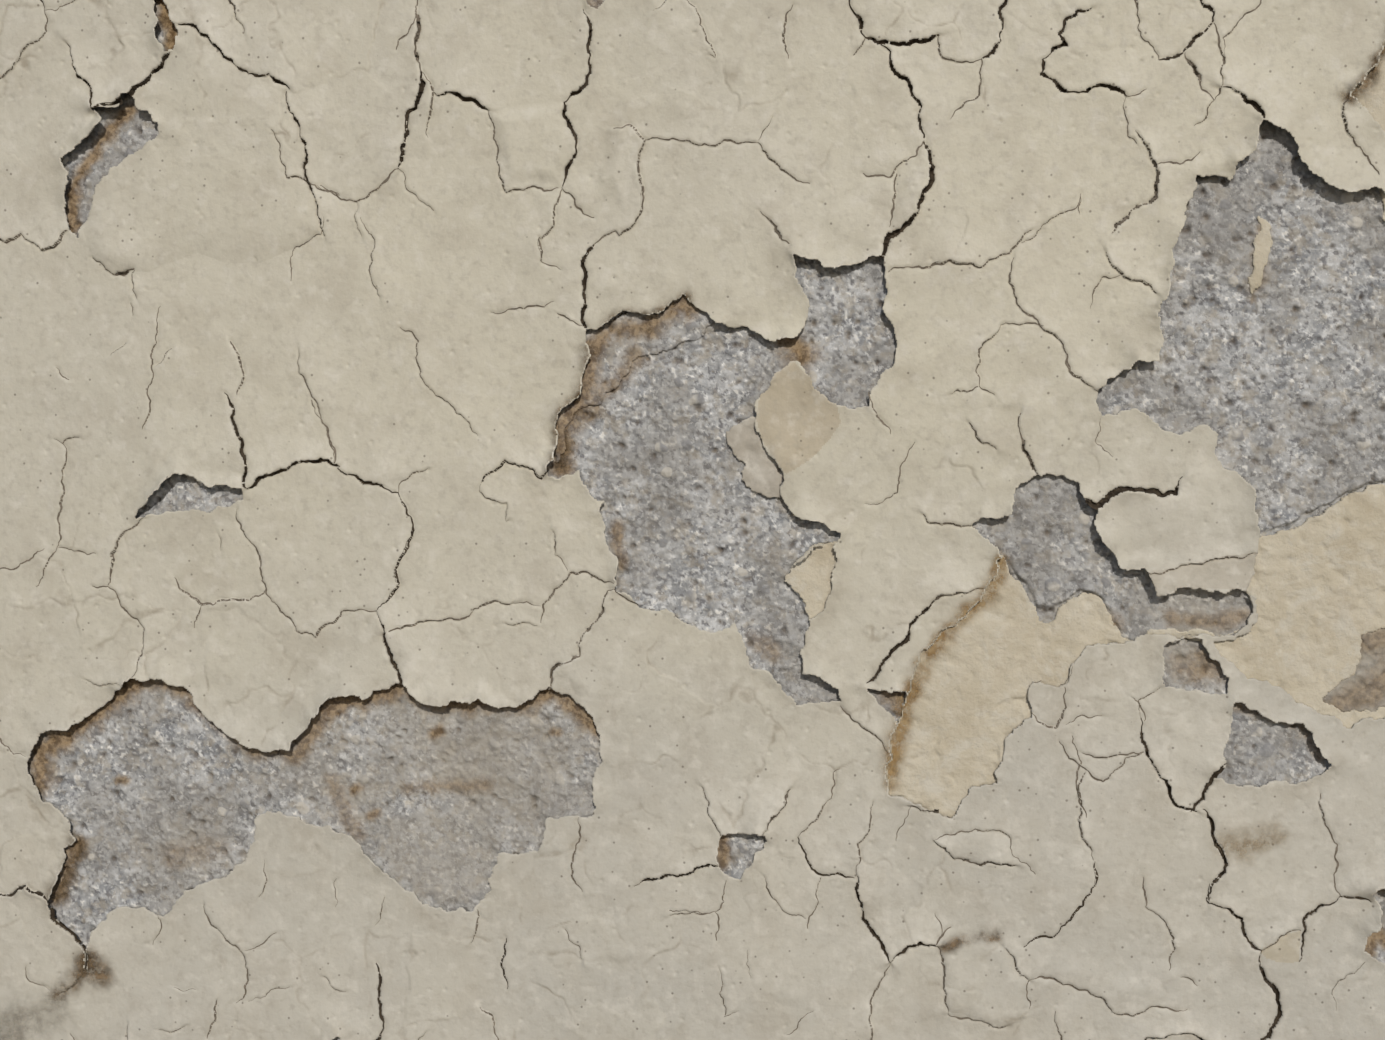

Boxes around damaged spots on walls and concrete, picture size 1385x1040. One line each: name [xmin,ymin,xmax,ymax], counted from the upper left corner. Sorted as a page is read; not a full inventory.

spalling [61,93,159,238]
crack [0,0,810,328]
crack [174,328,665,690]
spalling [0,169,897,947]
spalling [586,0,606,21]
crack [867,588,983,683]
crack [849,0,1183,510]
spalling [867,18,1385,818]
crack [1040,0,1265,309]
crack [0,885,87,994]
crack [763,666,1371,1040]
spalling [1261,889,1385,964]